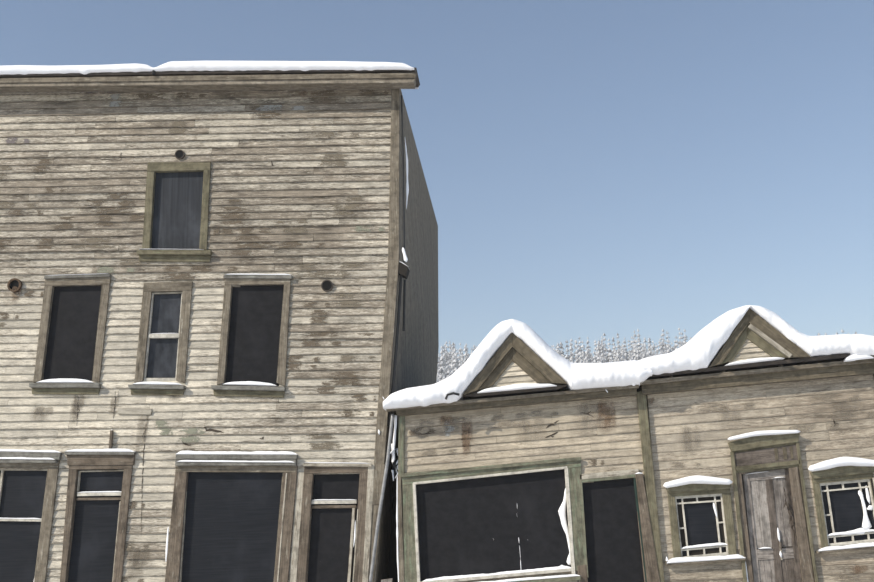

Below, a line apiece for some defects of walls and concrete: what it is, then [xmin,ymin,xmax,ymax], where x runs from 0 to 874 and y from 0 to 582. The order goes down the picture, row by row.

peeling [85,193,144,227]
peeling [36,217,74,249]
peeling [156,420,174,435]